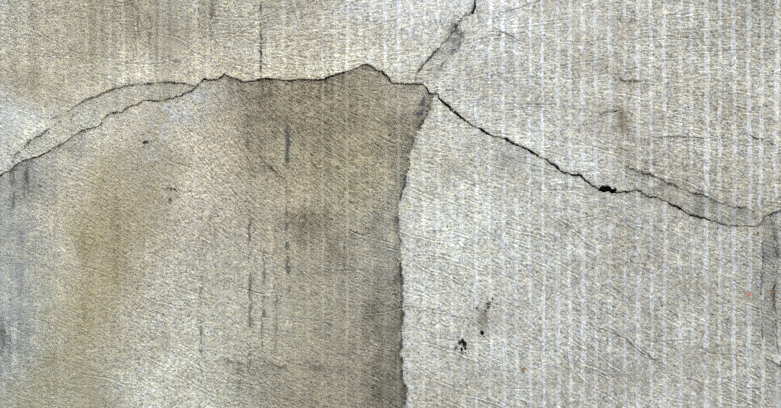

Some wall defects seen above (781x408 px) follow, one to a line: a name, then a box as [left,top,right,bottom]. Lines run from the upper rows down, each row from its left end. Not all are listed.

damp [247,66,369,188]
crack [86,6,670,198]
crack [672,191,720,224]